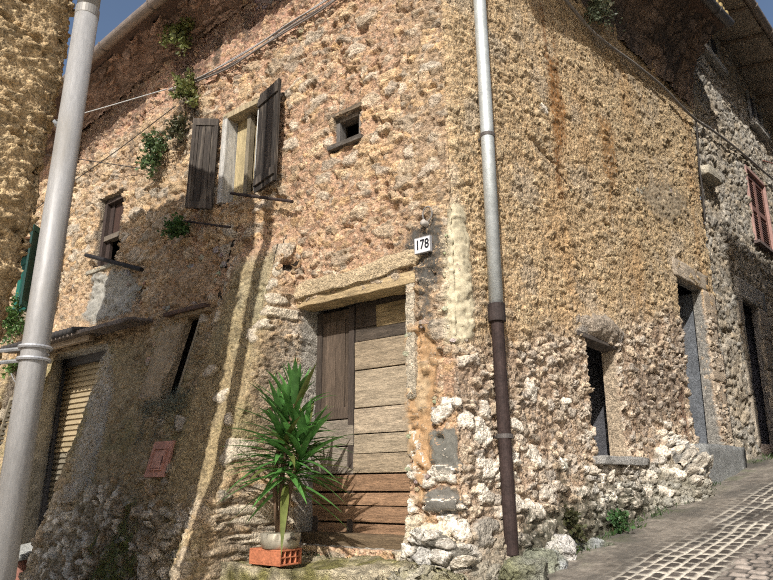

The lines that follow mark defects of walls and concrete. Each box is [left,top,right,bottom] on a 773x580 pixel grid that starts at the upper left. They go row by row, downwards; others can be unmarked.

rust [541,7,566,161]